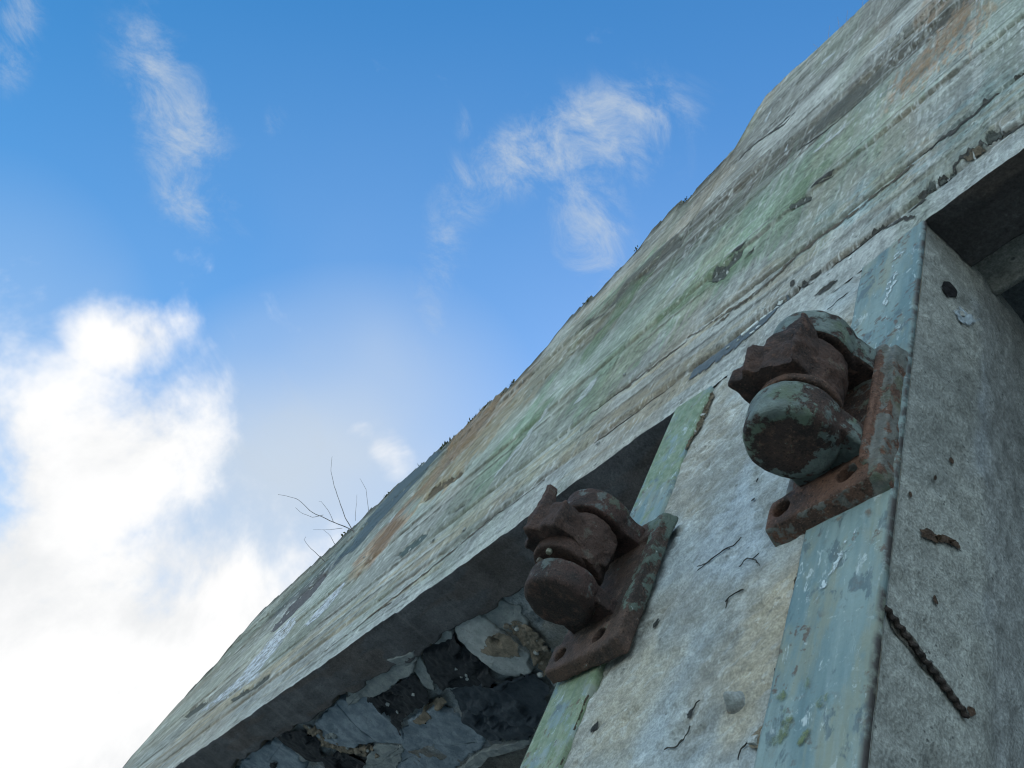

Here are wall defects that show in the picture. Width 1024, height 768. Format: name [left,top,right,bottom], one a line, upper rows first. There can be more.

peeling [820,527,858,588]
spalling [272,573,326,632]
peeling [231,598,552,768]